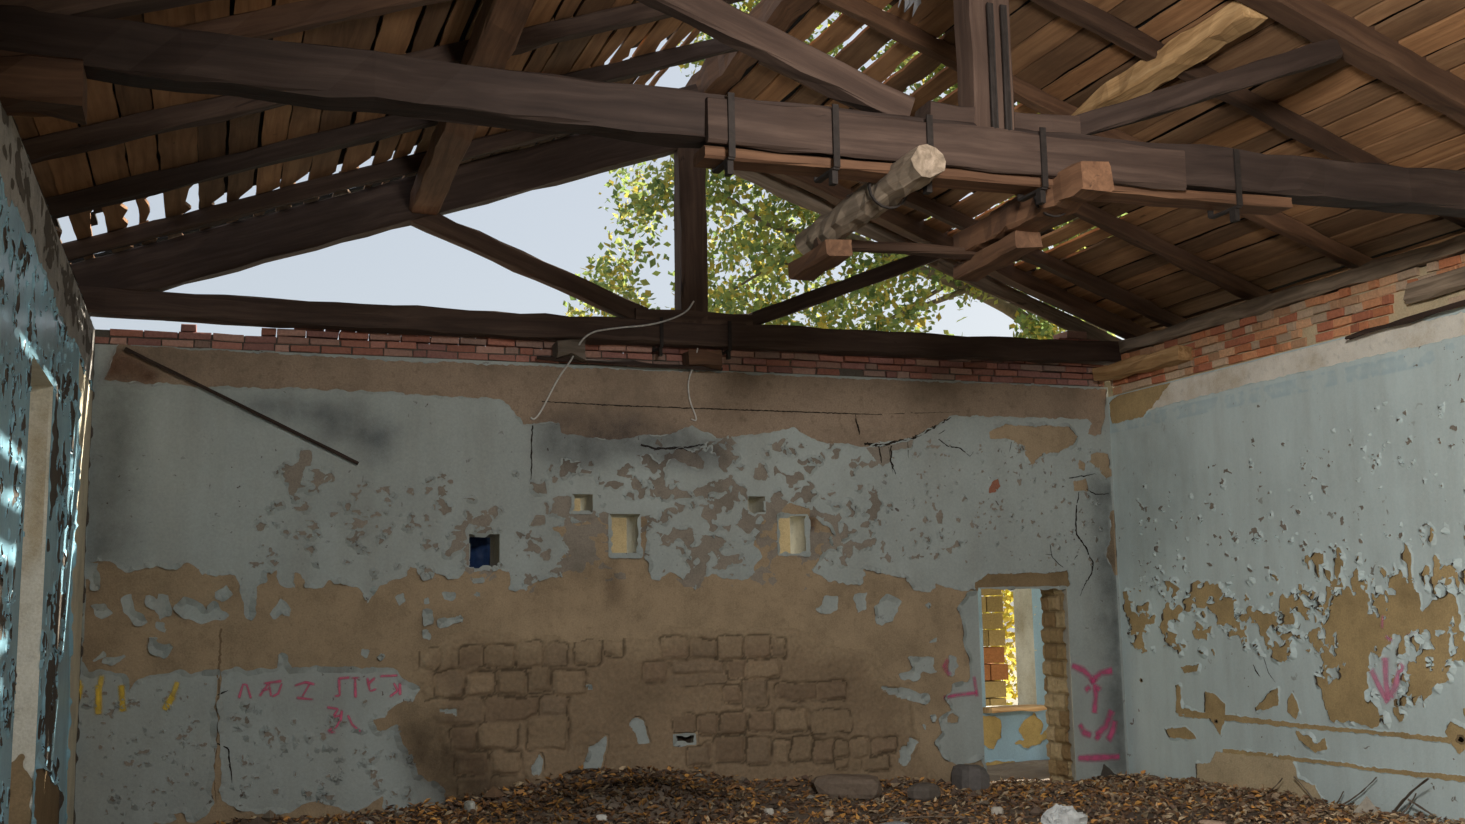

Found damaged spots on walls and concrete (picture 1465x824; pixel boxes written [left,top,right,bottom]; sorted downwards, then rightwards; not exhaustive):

flaking render [0,102,1118,824]
crack [1045,474,1109,596]
peeling [1122,401,1465,802]
peeling [1430,383,1465,460]